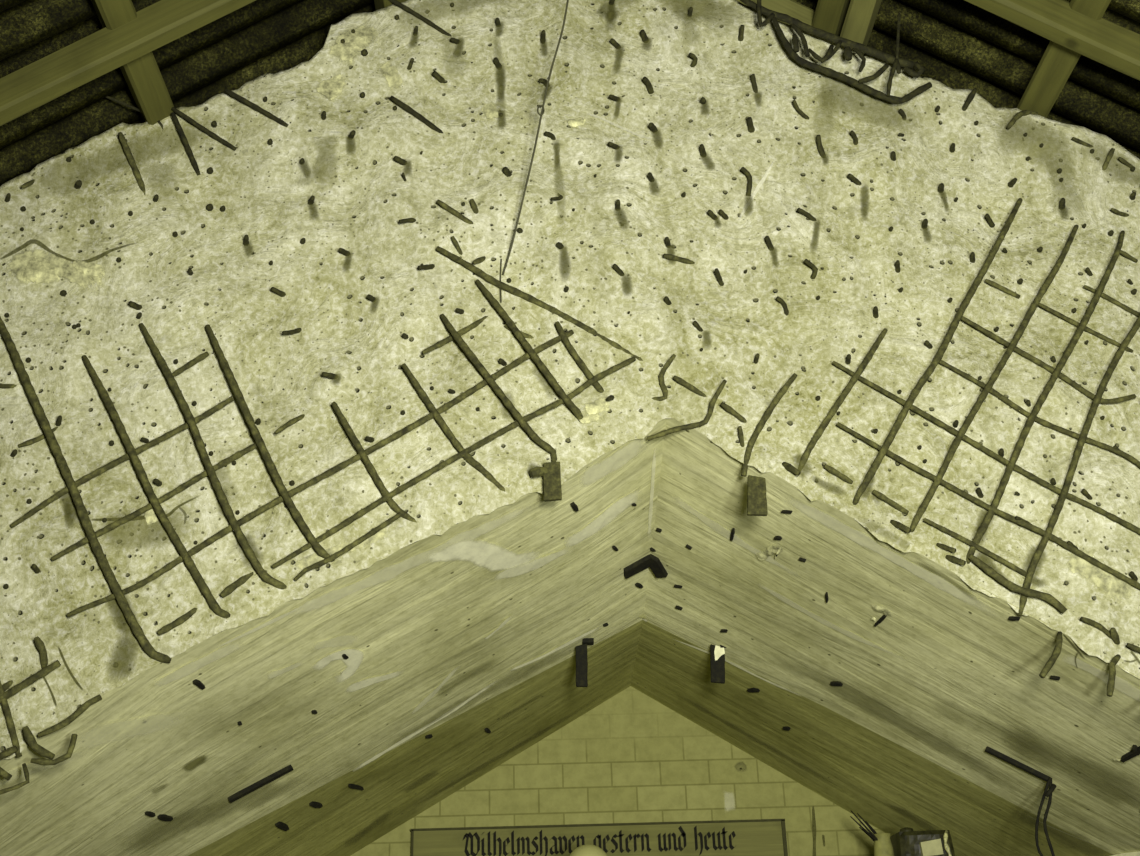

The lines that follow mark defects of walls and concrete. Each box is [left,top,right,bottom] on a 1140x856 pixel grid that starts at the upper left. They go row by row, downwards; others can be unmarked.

corrosion [601,4,616,19]
corrosion [614,47,623,70]
corrosion [616,209,627,227]
corrosion [561,247,569,276]
spalling [436,236,643,361]
corrosion [623,276,631,294]
spalling [274,414,305,434]
peeling [580,354,798,484]
spalling [296,529,385,569]
peeling [429,492,638,579]
spalling [1069,550,1131,599]
spalling [1080,617,1140,697]